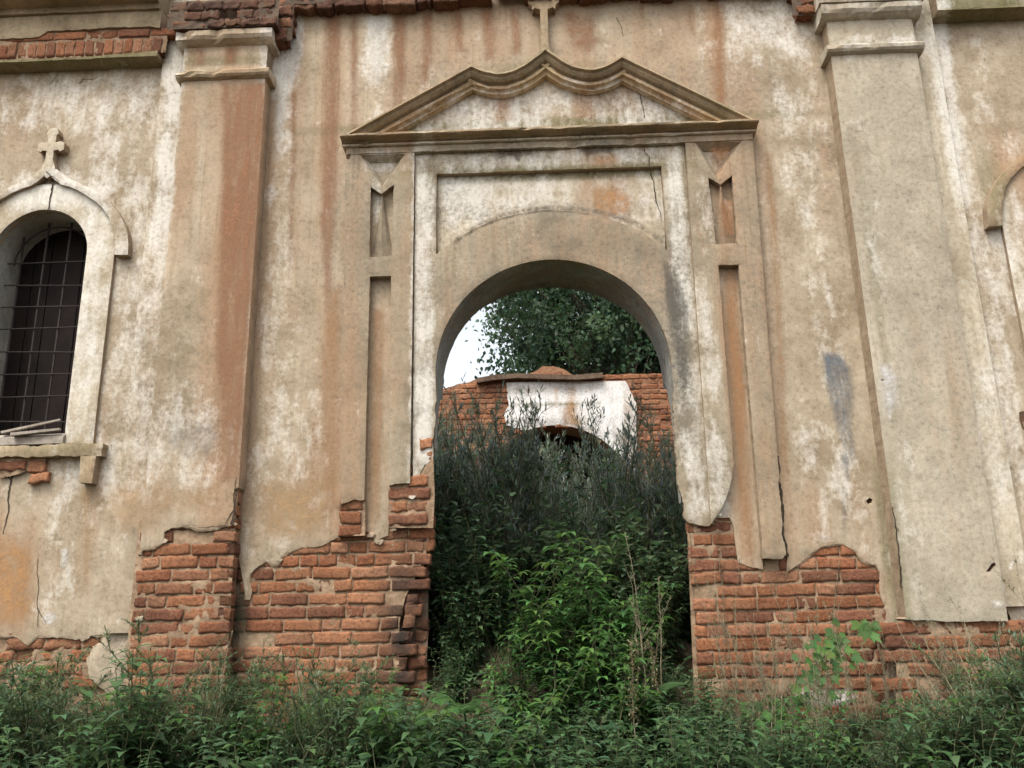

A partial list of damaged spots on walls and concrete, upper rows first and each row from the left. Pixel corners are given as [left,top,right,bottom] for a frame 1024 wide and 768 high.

flaking render [0,0,492,62]
crack [644,148,661,215]
crack [3,475,14,533]
crack [777,456,789,557]
flaking render [0,438,436,738]
flaking render [683,513,1024,727]
crack [892,507,903,588]